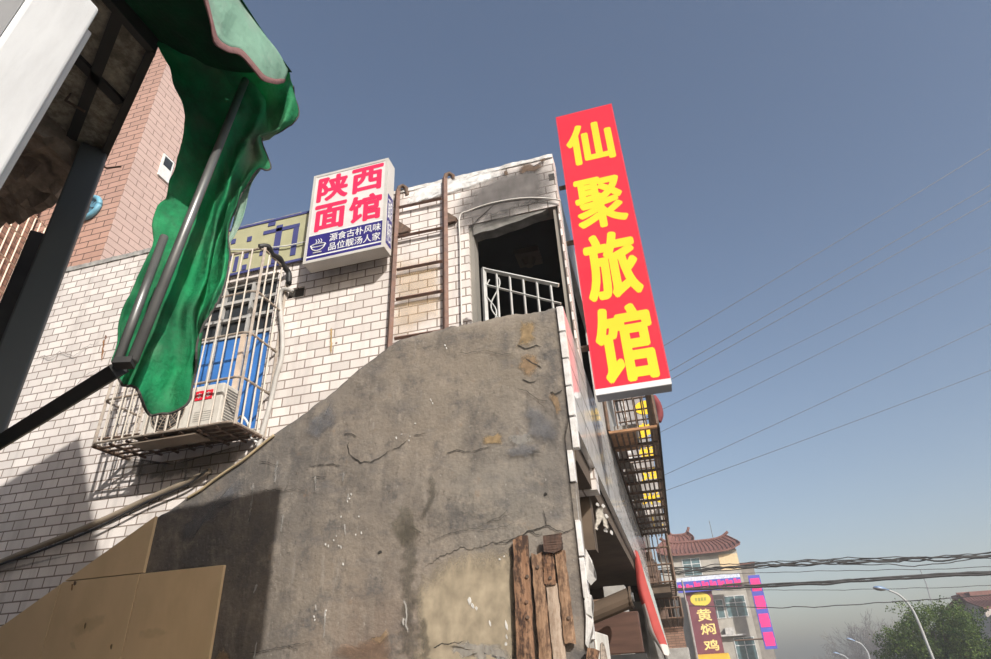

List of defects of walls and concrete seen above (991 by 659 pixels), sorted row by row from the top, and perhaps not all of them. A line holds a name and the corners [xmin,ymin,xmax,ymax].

water stain [411,168,551,223]
spalling [517,322,542,383]
crack [261,433,425,492]
crack [439,510,576,544]